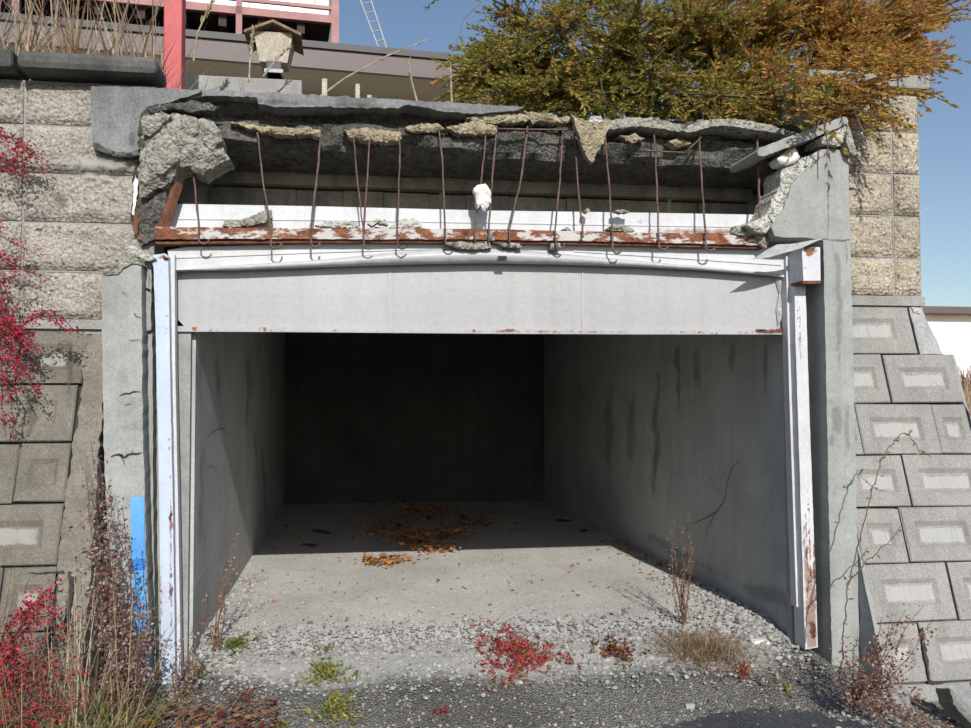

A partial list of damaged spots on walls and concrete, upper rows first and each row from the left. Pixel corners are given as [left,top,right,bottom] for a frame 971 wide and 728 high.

spalling [343,111,570,146]
spalling [587,116,795,150]
spalling [741,149,823,235]
peeling [753,238,823,259]
crack [111,450,143,462]
crack [684,460,739,544]
rust [804,522,817,647]